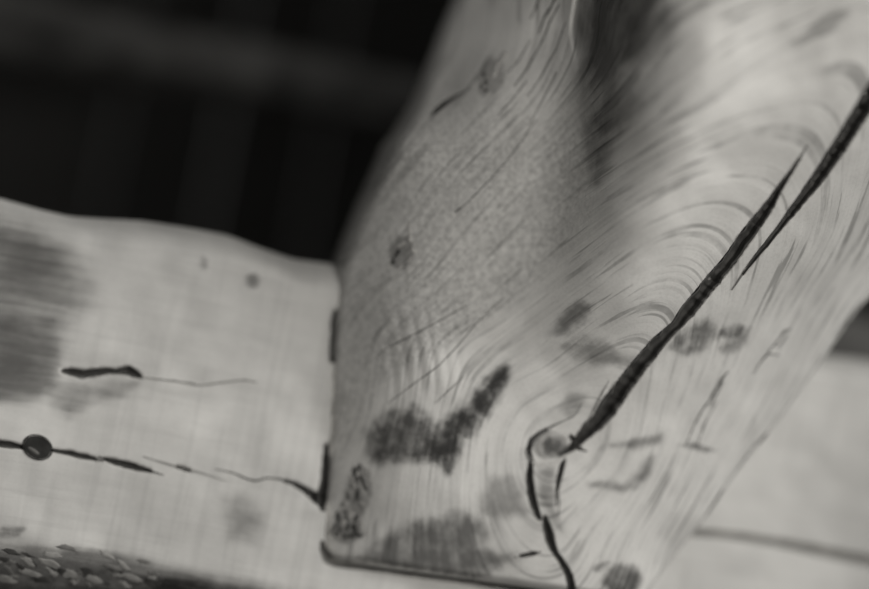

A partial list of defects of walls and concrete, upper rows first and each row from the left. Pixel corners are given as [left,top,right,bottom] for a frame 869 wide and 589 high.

crack [512,85,869,589]
crack [61,366,257,386]
crack [0,441,23,449]
crack [53,449,322,504]